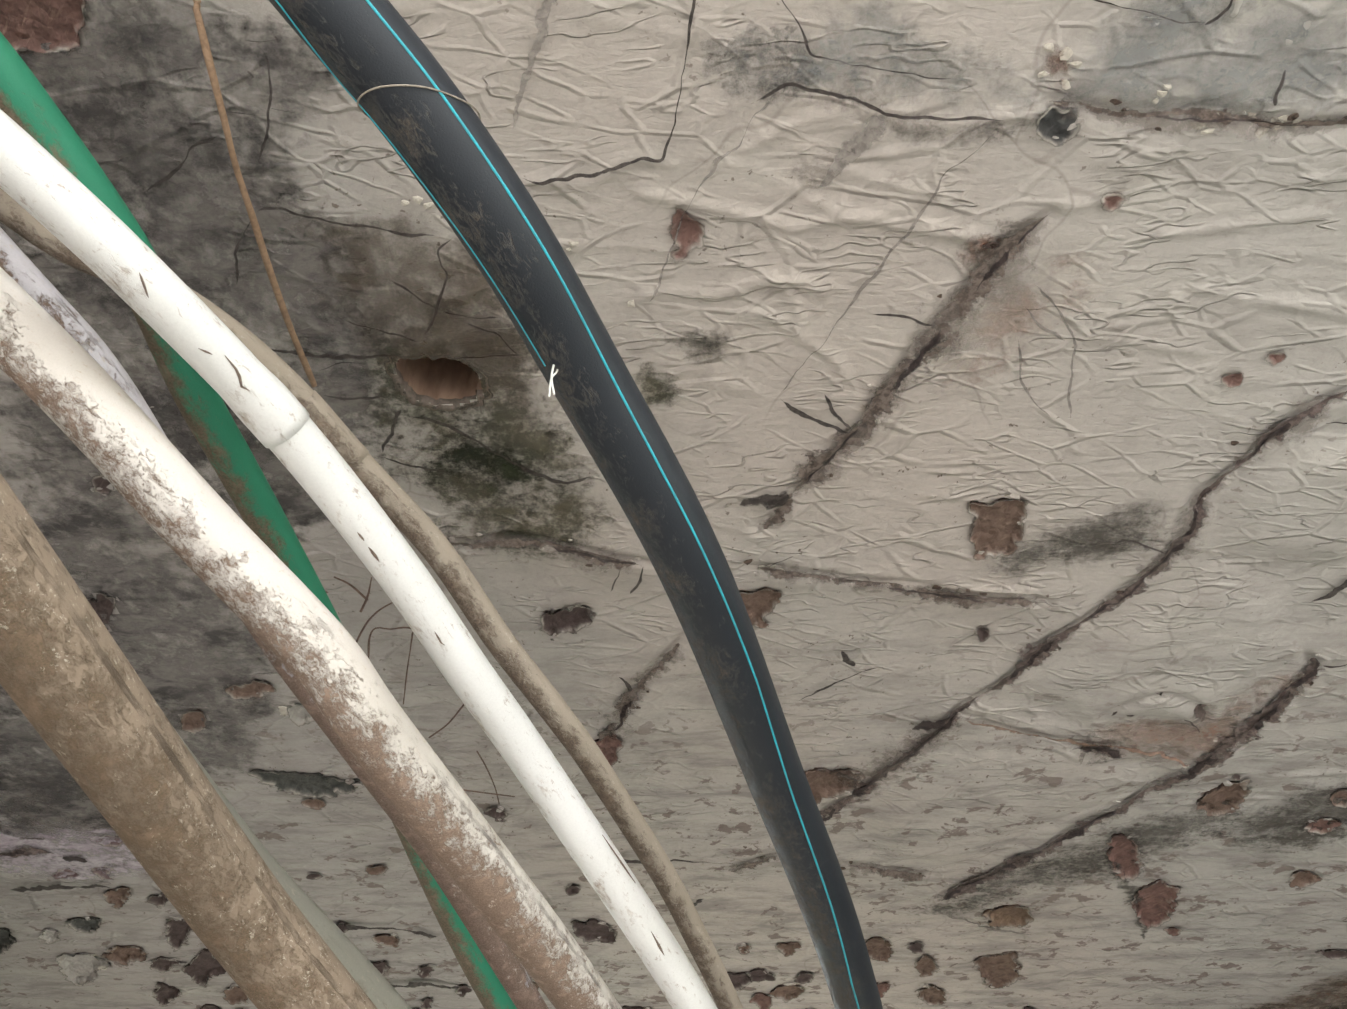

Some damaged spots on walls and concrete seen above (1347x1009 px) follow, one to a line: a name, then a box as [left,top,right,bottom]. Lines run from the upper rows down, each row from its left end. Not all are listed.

crack [1054,70,1347,131]
crack [651,0,1046,529]
spalling [968,493,1028,560]
damp [0,383,274,773]
crack [744,556,1034,609]
crack [799,651,878,701]
crack [820,391,1347,935]
damp [0,684,145,880]
spalling [39,893,251,1009]
spalling [727,942,814,1009]
spalling [865,937,946,1006]
spalling [974,951,1023,990]